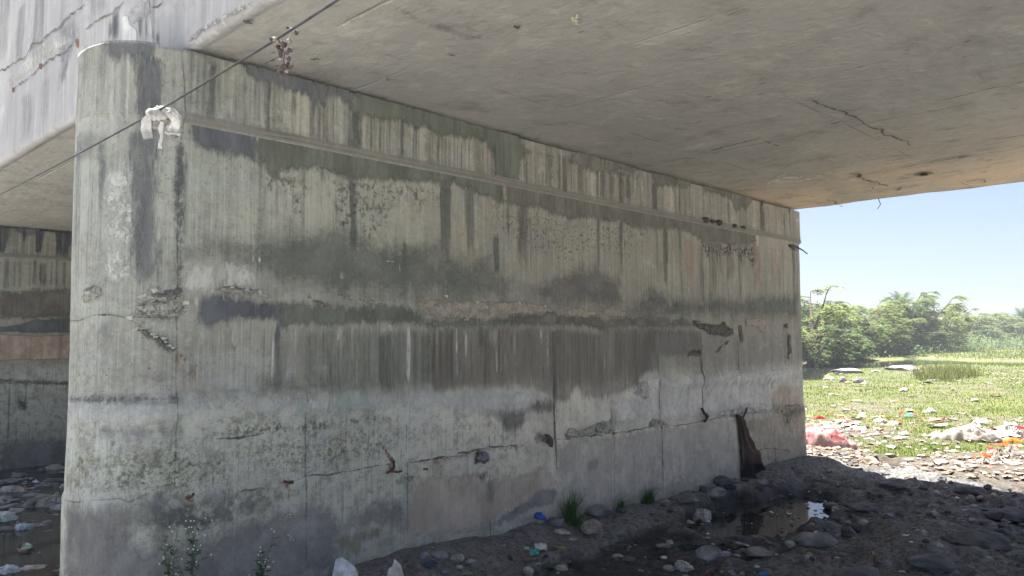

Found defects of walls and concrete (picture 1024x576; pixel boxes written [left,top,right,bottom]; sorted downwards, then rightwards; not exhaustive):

crack [0,2,123,86]
crack [813,101,986,191]
water stain [0,225,72,333]
spalling [126,288,189,352]
water stain [173,63,796,430]
spalling [692,320,743,352]
water stain [0,440,66,469]
spalling [564,419,616,439]
crack [553,331,797,496]